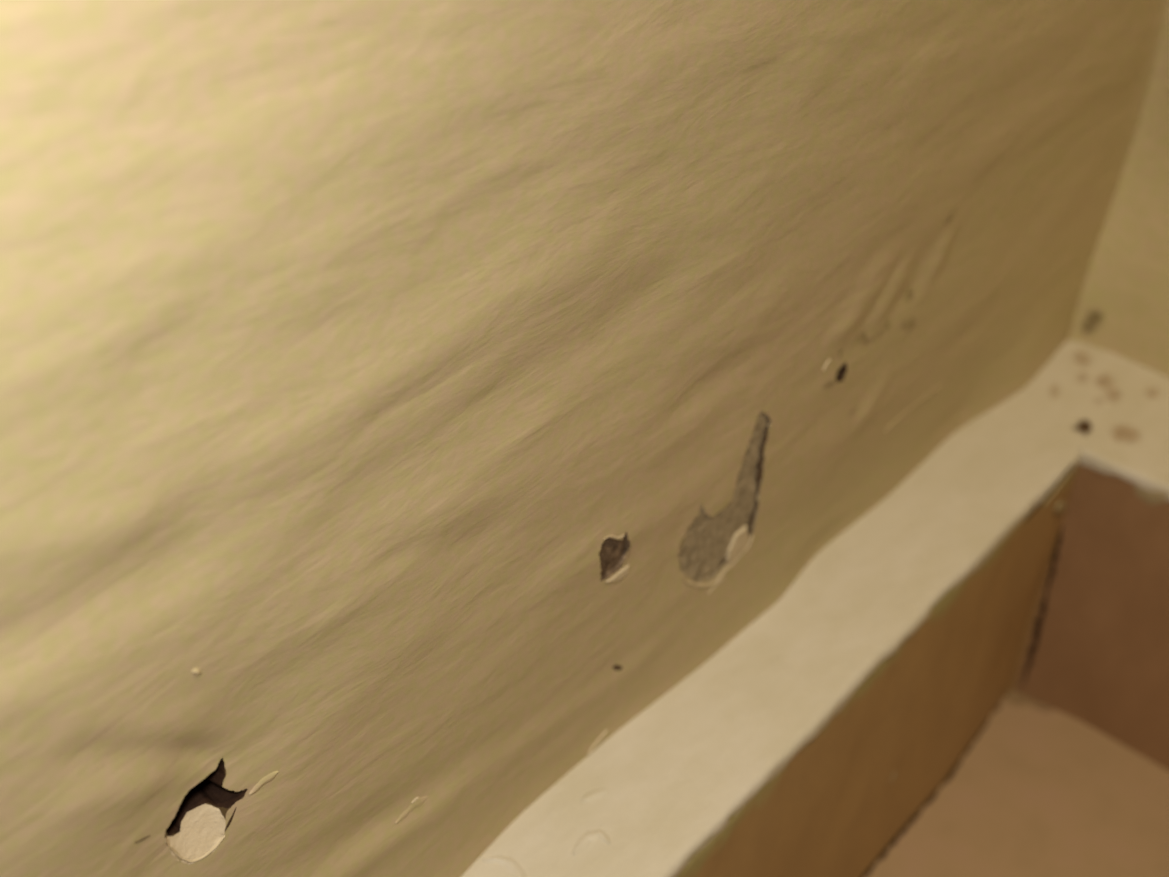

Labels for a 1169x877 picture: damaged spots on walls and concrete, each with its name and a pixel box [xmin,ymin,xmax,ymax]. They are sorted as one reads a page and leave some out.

flaking render [599,531,631,583]
peeling [678,411,772,594]
crack [862,464,1073,877]
flaking render [165,757,279,865]